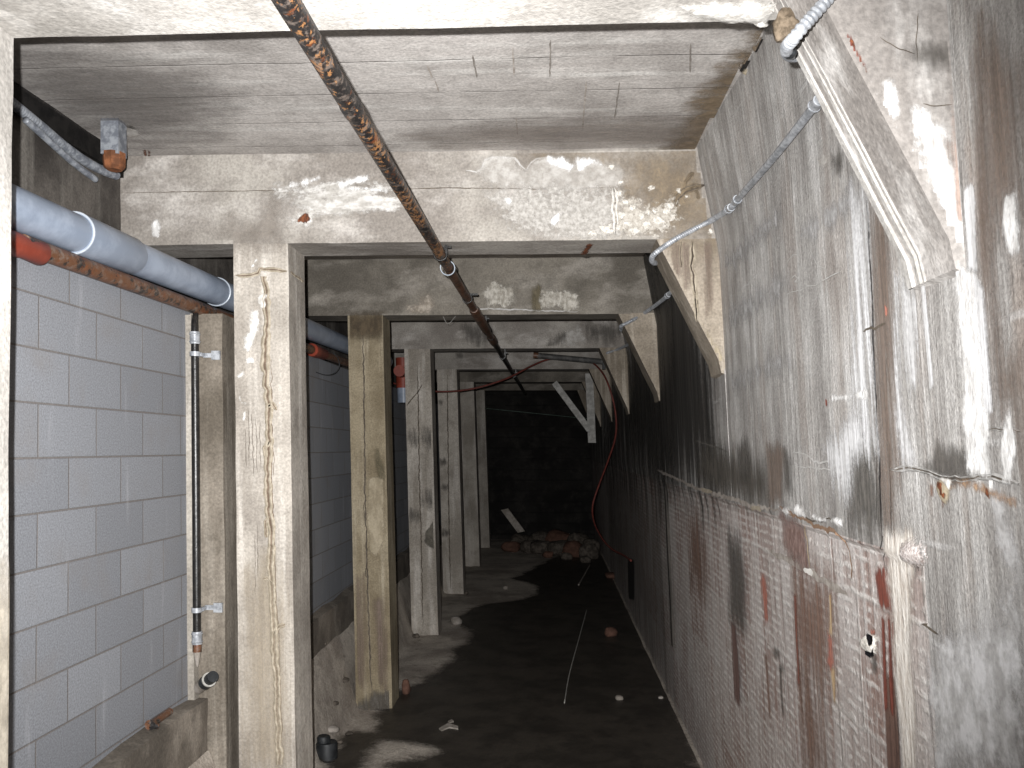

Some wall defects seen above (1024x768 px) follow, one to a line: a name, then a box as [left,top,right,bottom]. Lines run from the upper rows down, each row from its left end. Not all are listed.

crack [235,267,304,765]
damp [233,176,401,242]
damp [482,281,515,309]
damp [532,285,580,311]
damp [467,31,762,300]
damp [593,183,933,768]
crack [863,200,1021,570]
corrosion [959,479,1015,504]
corrosion [779,506,852,768]
spalling [859,630,878,670]
corrosion [875,567,900,768]